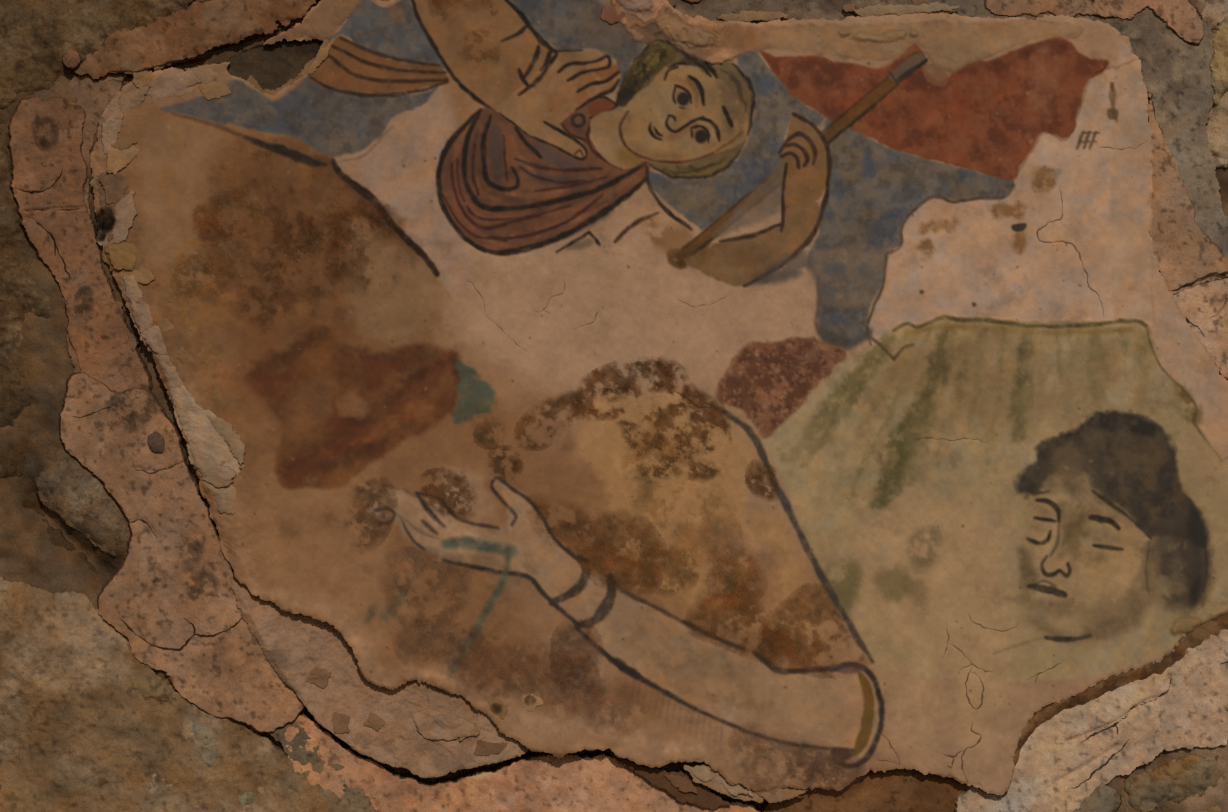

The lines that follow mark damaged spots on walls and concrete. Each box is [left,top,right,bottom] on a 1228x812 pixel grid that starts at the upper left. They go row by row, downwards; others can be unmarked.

flaking render [716,10,789,22]
flaking render [842,0,960,17]
damp [517,360,728,478]
damp [423,476,466,515]
damp [746,466,775,498]
spalling [1005,614,1228,794]